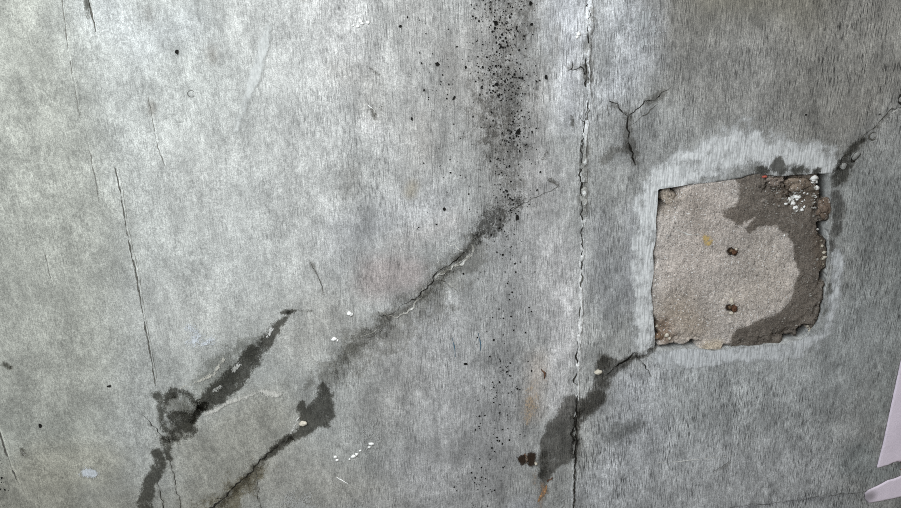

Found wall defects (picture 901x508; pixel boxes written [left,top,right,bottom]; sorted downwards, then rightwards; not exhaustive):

crack [607,90,666,164]
crack [363,242,474,338]
peeling [745,174,827,332]
damp [137,309,296,508]
damp [263,382,335,461]
rust [518,452,552,506]